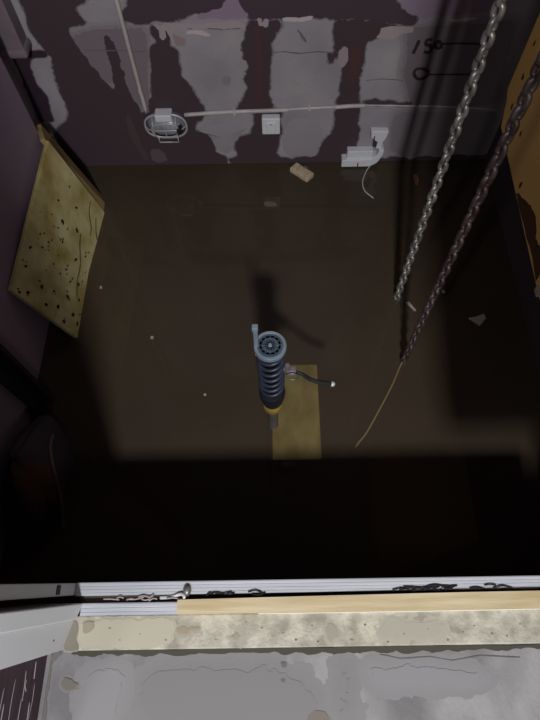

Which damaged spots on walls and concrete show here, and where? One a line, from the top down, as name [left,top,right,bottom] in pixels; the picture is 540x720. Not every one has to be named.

peeling [153,0,248,46]
peeling [377,26,414,40]
peeling [338,46,348,68]